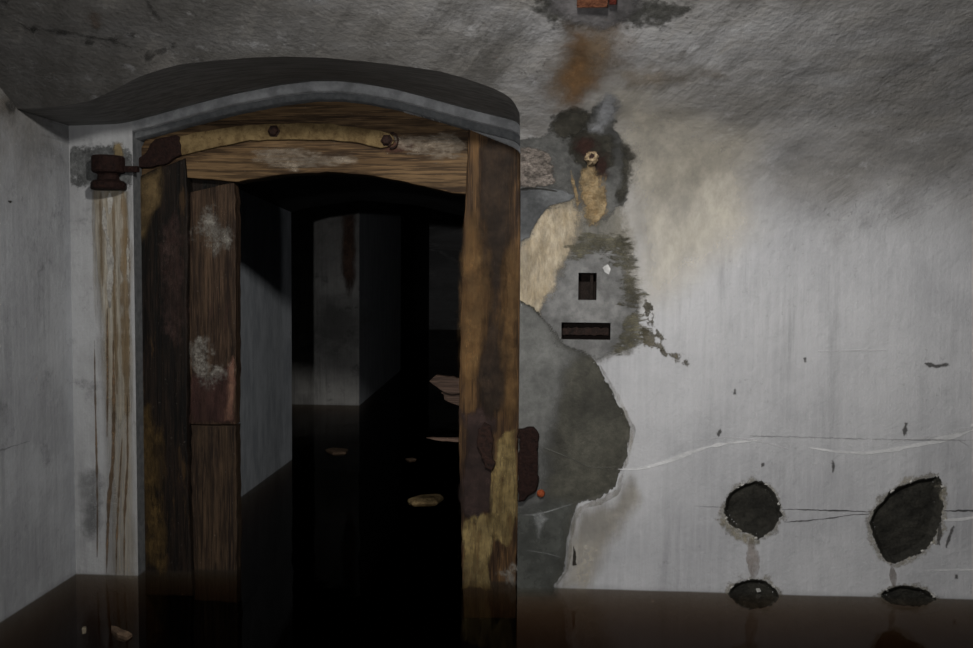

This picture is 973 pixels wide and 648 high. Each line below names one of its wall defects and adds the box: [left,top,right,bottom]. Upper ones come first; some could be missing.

flaking render [520,95,641,314]
rust [554,26,611,100]
rust [93,190,132,572]
peeling [517,300,631,595]